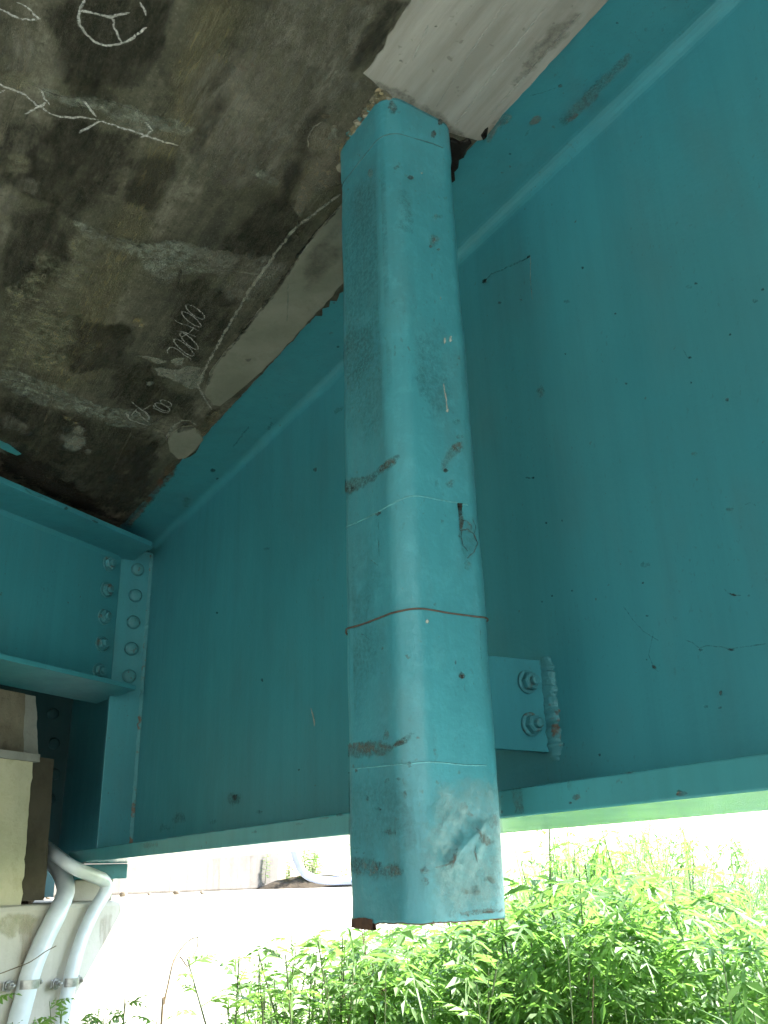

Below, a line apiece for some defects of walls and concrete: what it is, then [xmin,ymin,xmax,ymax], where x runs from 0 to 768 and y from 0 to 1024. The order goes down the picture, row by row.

leakage [0,0,406,523]
crack [208,209,337,382]